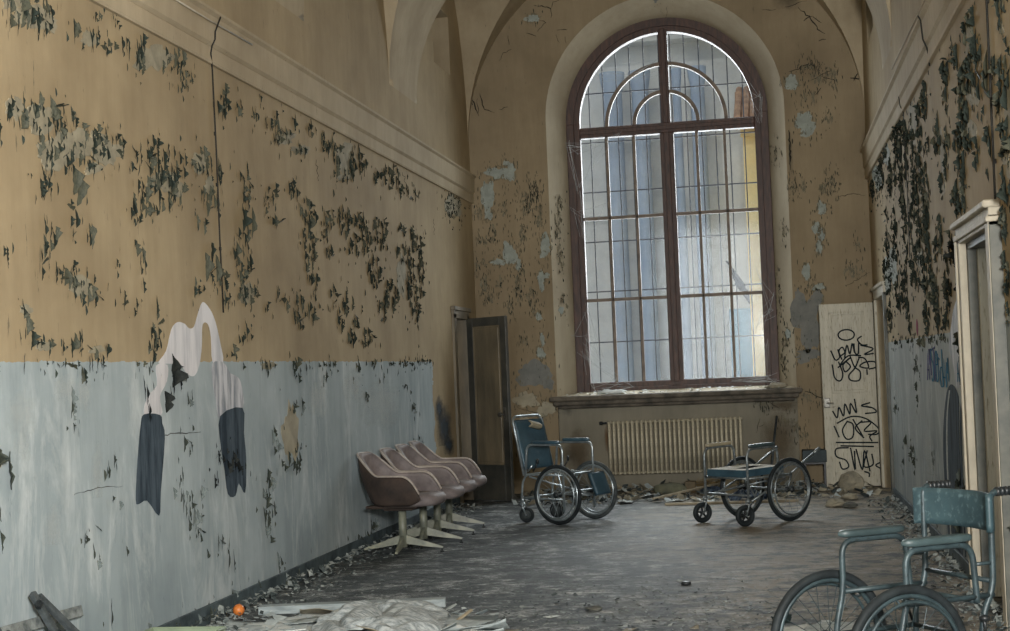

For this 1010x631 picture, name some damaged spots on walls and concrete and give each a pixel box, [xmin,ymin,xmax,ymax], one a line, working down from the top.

peeling [2,0,195,102]
crack [764,1,826,41]
peeling [783,50,843,147]
crack [789,64,859,98]
peeling [869,0,1010,407]
peeling [0,83,434,431]
peeling [770,137,840,379]
peeling [0,449,15,490]
peeling [272,399,306,476]
peeling [902,435,915,475]
peeling [80,526,103,570]
peeling [173,426,473,631]